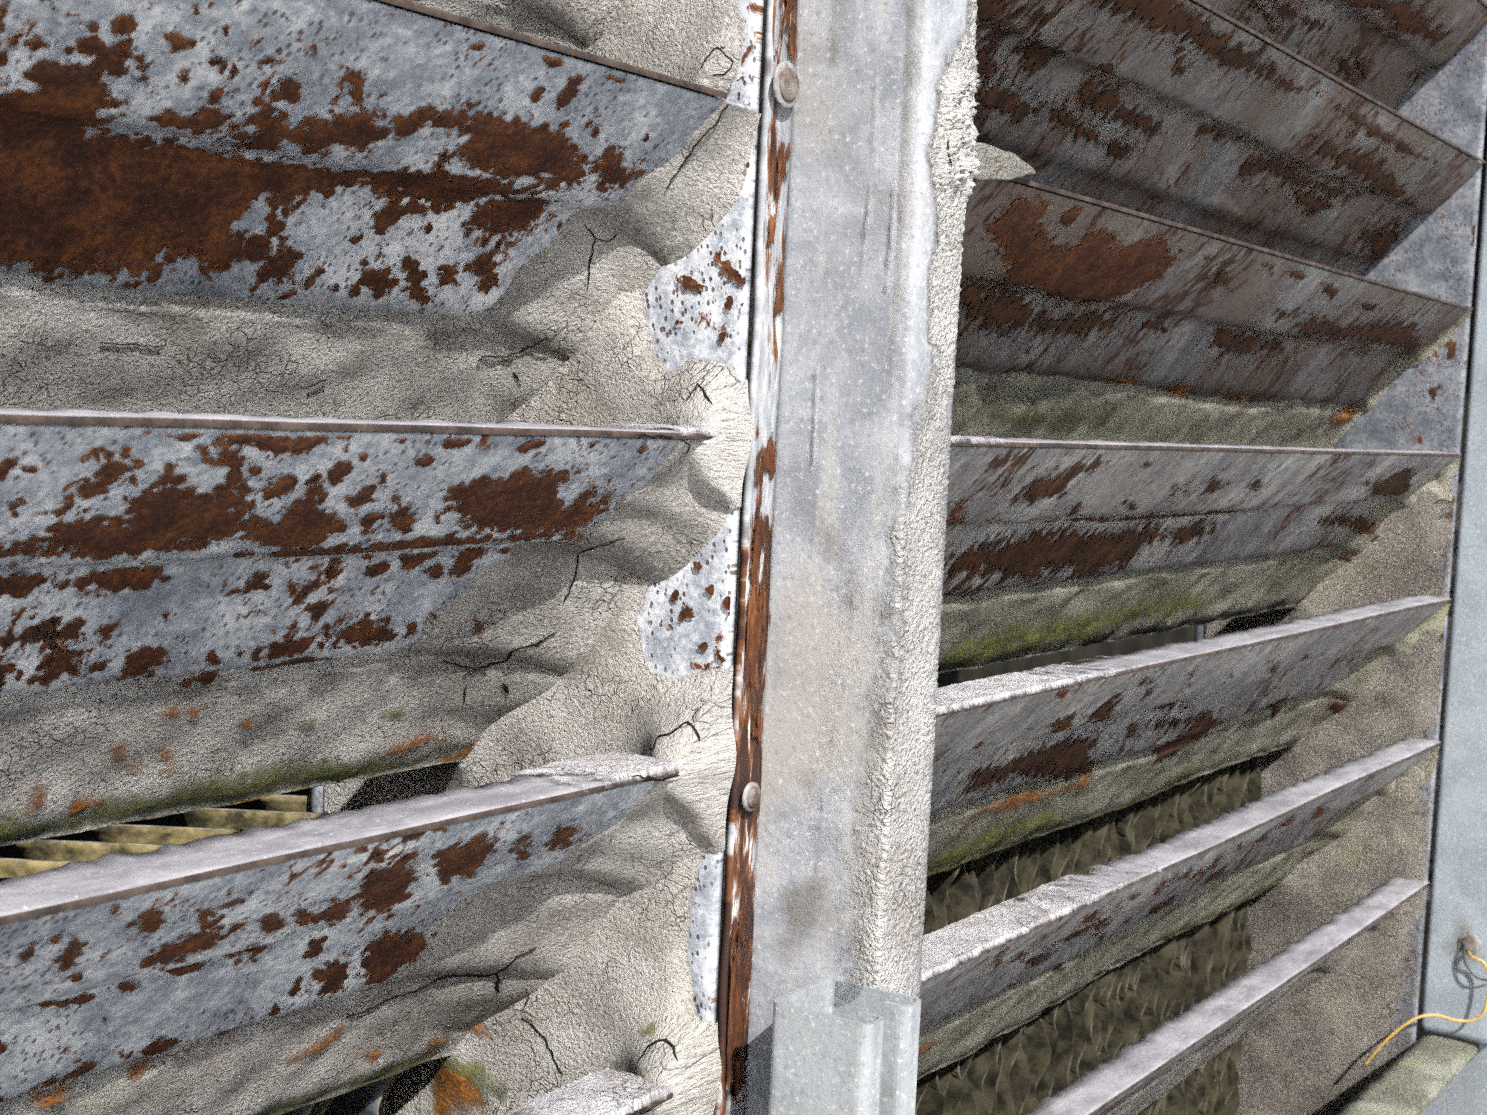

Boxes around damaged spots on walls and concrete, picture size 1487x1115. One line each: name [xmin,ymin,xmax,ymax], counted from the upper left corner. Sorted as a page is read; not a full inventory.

rust [0,3,649,306]
crack [666,45,734,189]
crack [687,383,712,404]
rust [0,433,617,697]
crack [444,538,625,704]
rust [693,511,771,743]
rust [943,451,1264,588]
leakage [954,601,1299,669]
rust [964,670,1224,824]
rust [110,821,584,1017]
crack [345,947,563,1074]
crack [637,1039,678,1061]